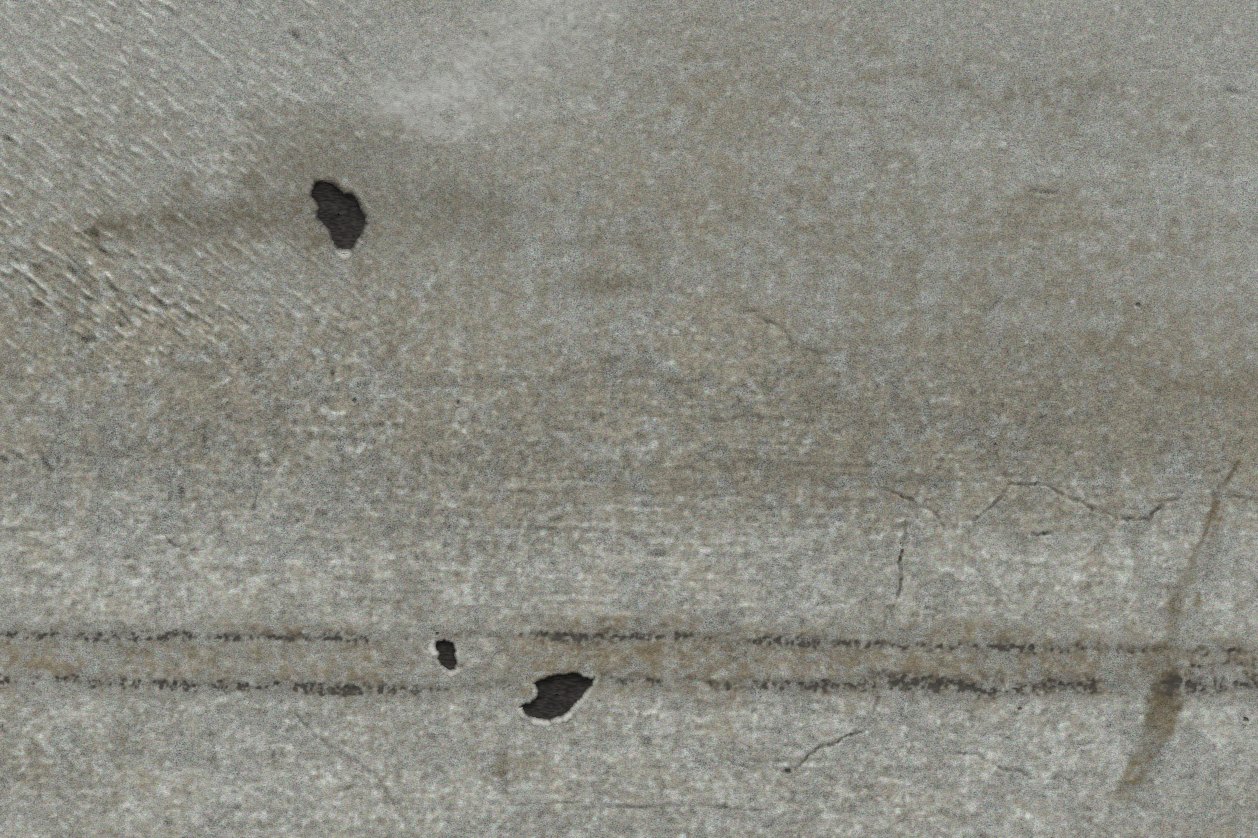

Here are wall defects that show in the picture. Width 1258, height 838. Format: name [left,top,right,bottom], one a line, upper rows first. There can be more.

crack [876,445,1258,629]
damp [0,617,284,647]
damp [1097,455,1258,807]
damp [0,669,528,711]
damp [748,669,1086,715]
crack [780,694,881,774]
crack [490,799,781,838]